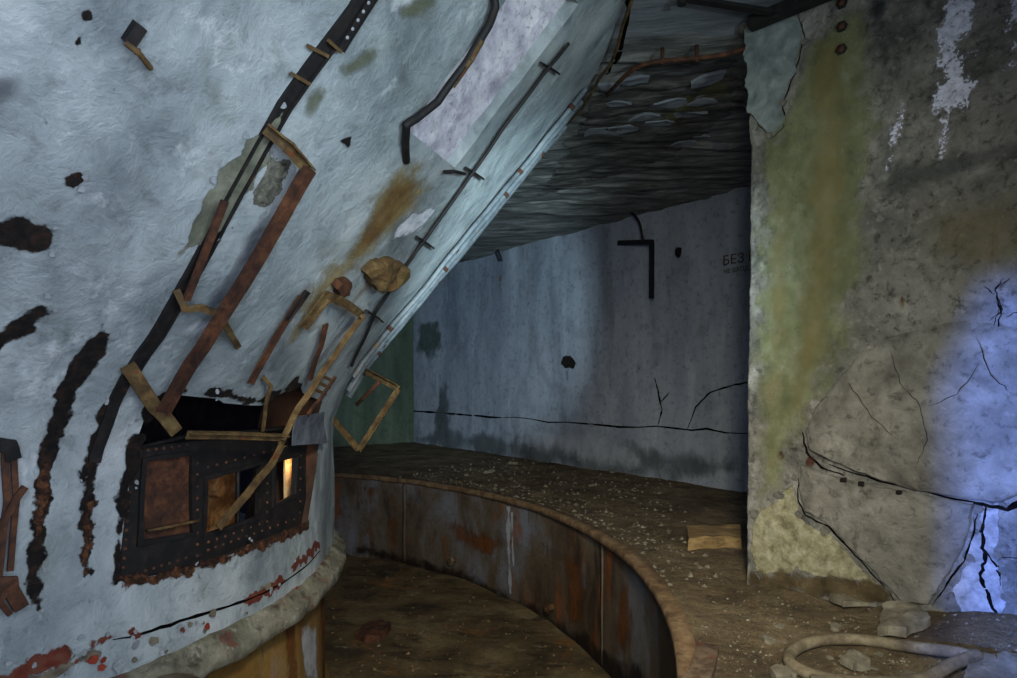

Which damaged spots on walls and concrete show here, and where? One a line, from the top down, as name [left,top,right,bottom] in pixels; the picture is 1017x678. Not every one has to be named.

damp [1003,0,1017,32]
damp [884,0,981,188]
peeling [0,216,58,257]
peeling [0,293,59,350]
peeling [178,131,291,254]
rust [247,166,421,432]
damp [756,14,879,486]
crack [984,278,1017,327]
crack [414,378,748,434]
peeling [24,331,110,612]
crack [829,464,1017,613]
rust [286,625,297,678]